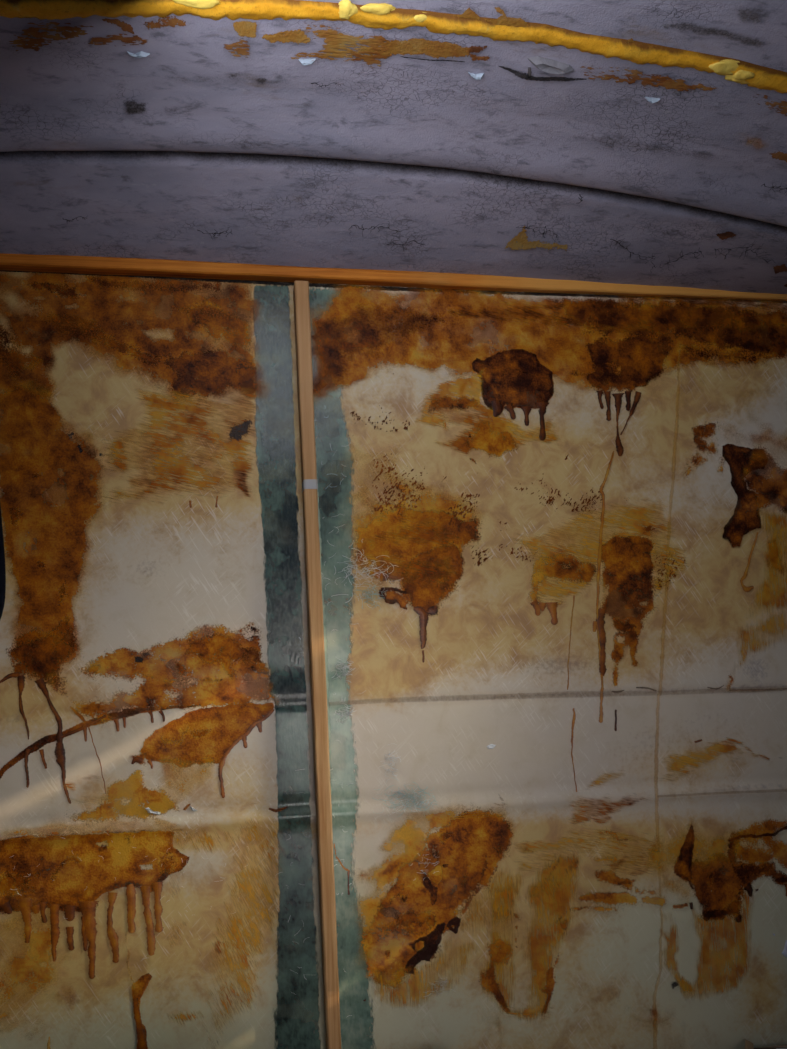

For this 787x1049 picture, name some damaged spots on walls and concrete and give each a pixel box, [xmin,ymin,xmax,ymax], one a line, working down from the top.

peeling [102,16,186,36]
peeling [224,21,490,68]
peeling [453,7,530,27]
peeling [505,226,568,251]
rust [311,286,787,465]
rust [685,423,787,548]
rust [0,273,279,979]
rust [355,480,480,663]
rust [523,506,685,686]
rust [571,798,644,823]
rust [361,809,787,1018]